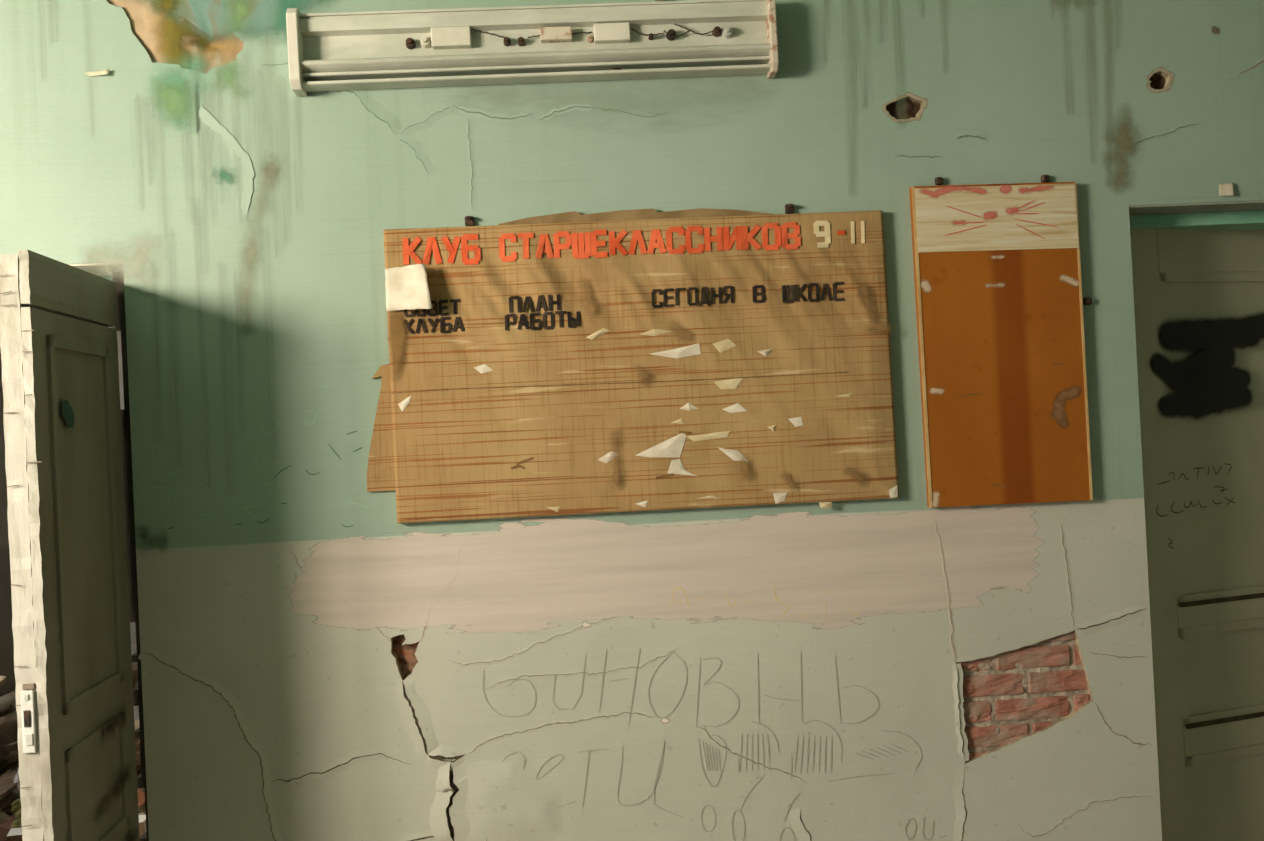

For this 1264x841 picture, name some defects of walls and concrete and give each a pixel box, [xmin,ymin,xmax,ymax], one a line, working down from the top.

peeling [107,0,179,63]
peeling [182,33,244,73]
spalling [883,93,927,122]
spalling [1147,67,1174,93]
crack [1059,522,1148,660]
spalling [393,634,420,679]
crack [447,616,681,691]
crack [934,519,976,841]
flaking render [956,631,1090,762]
crack [271,678,662,841]
crack [695,724,825,841]
crack [1017,794,1153,839]